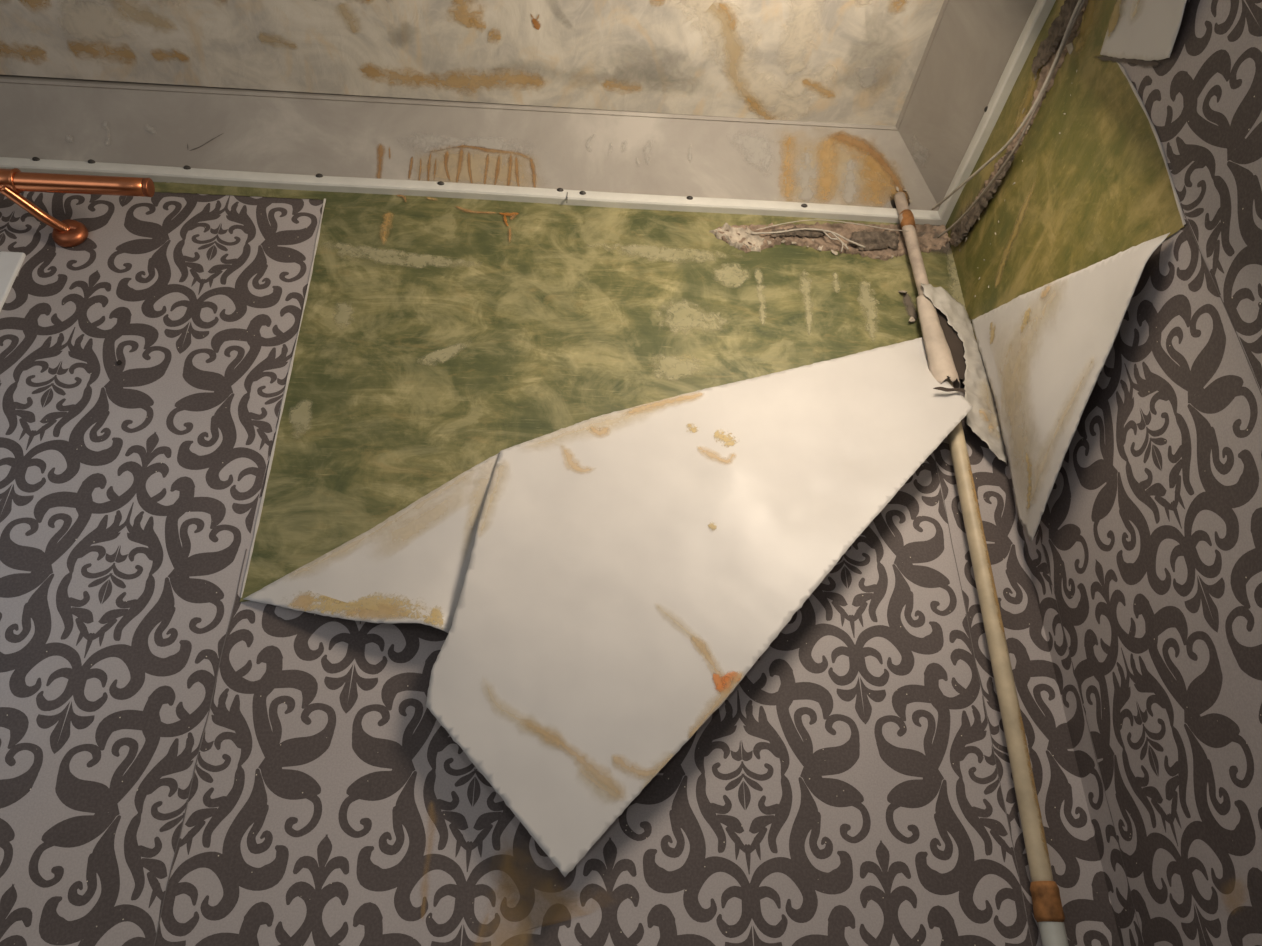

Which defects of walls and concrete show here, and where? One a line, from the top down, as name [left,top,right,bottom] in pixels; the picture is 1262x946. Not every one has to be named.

leakage [63,0,135,59]
leakage [361,66,543,90]
leakage [453,0,501,40]
leakage [682,0,835,120]
leakage [737,134,908,204]
peeling [153,0,1187,877]